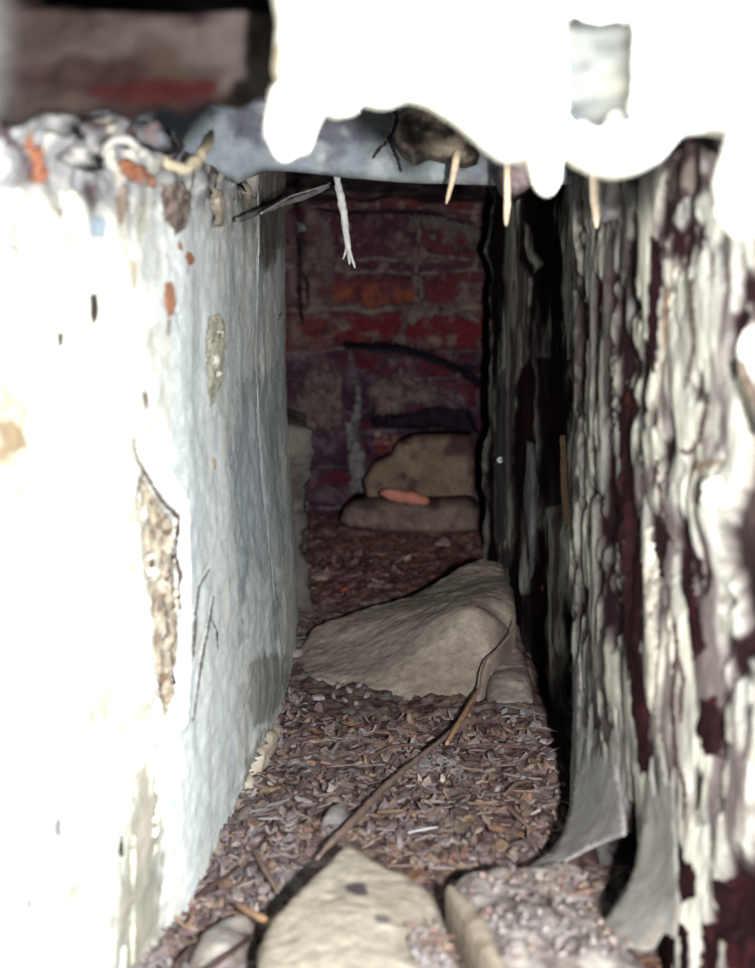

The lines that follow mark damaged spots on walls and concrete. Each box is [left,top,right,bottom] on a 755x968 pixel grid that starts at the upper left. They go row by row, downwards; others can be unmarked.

flaking render [24,130,50,184]
flaking render [59,190,84,235]
flaking render [117,158,192,235]
flaking render [664,133,725,204]
peeling [647,235,663,374]
flaking render [205,314,226,406]
peeling [701,477,723,510]
flaking render [137,436,192,718]
peeling [613,386,708,777]
peeling [695,695,732,758]
peeling [678,859,696,904]
peeling [662,874,755,968]